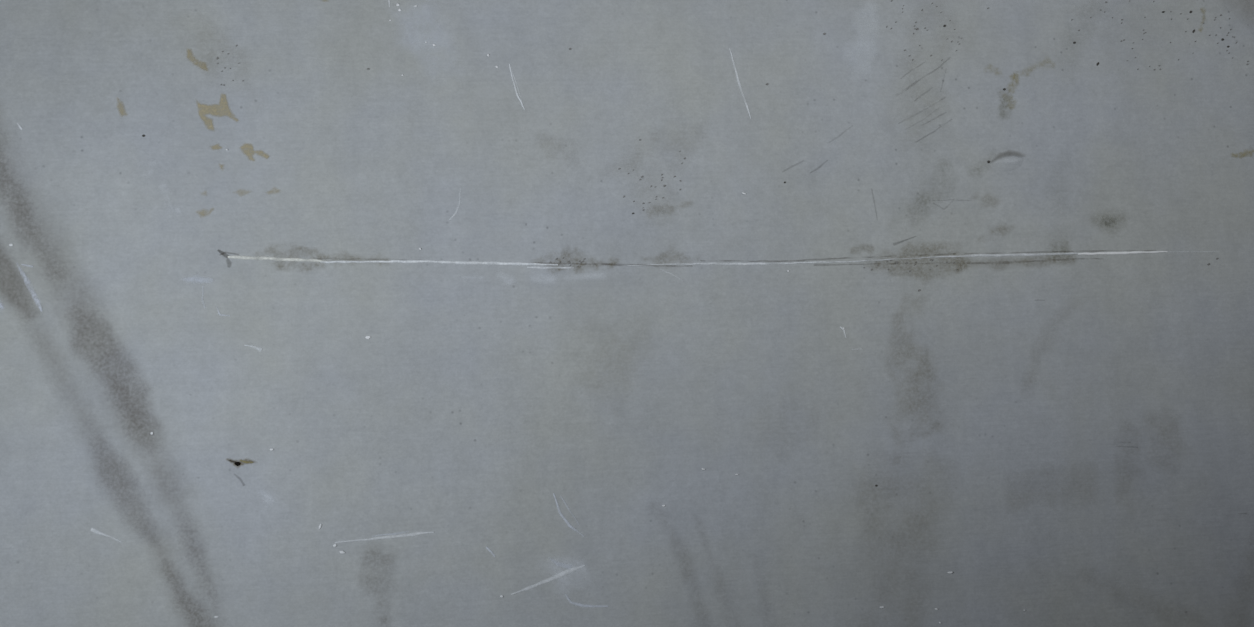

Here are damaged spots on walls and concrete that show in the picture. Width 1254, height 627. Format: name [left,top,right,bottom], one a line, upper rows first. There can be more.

peeling [188,45,244,129]
crack [228,256,571,269]
crack [627,251,1168,266]